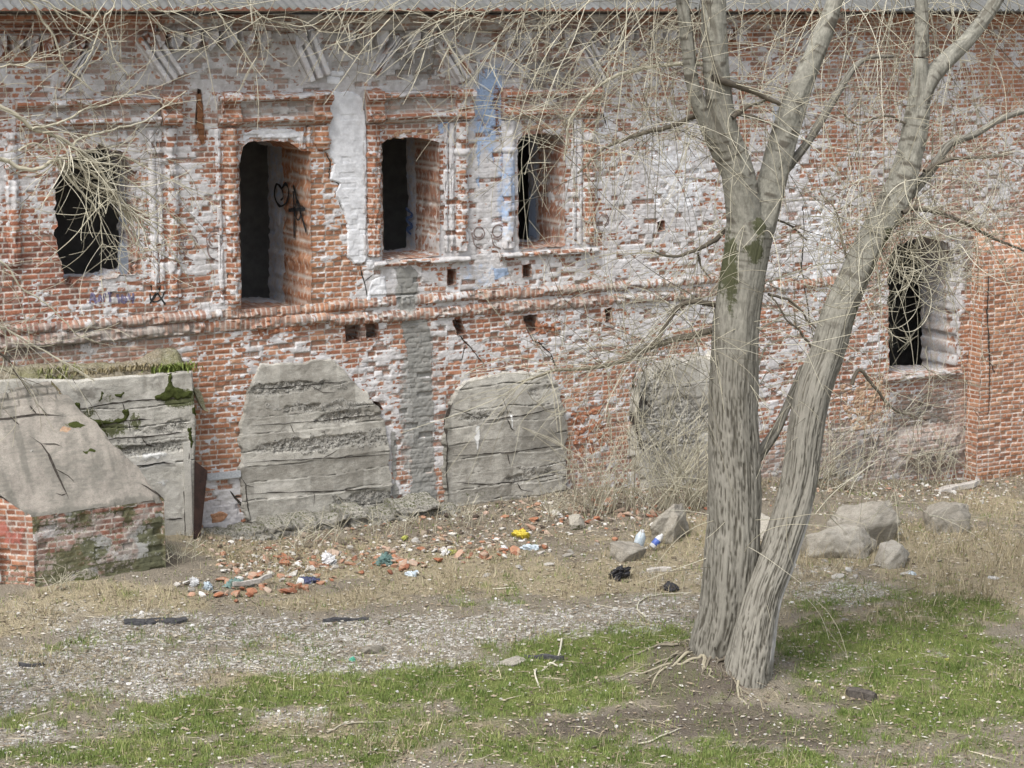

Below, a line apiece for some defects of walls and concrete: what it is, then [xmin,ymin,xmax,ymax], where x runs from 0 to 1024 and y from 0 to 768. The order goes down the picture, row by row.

peeling [243,129,300,143]
peeling [325,62,387,302]
peeling [647,129,707,213]
spalling [258,310,317,337]
spalling [535,320,561,334]
crack [986,265,995,424]
crack [0,405,71,496]